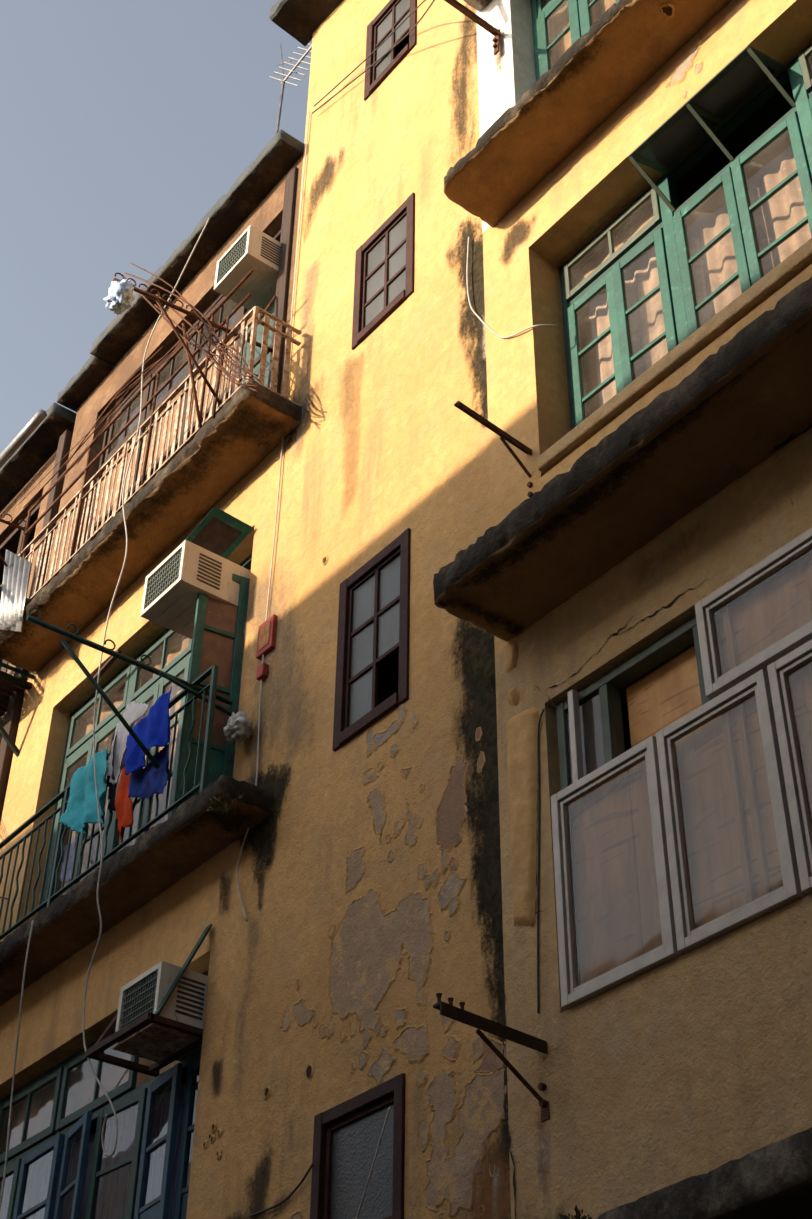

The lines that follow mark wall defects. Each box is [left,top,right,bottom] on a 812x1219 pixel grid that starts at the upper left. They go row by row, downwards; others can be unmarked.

leakage [452,0,493,152]
leakage [502,219,534,263]
leakage [447,220,488,425]
leakage [437,374,743,1042]
crack [536,580,706,712]
leakage [175,764,292,910]
peeling [280,704,508,1219]
leakage [228,1156,286,1219]
leakage [495,1066,509,1164]